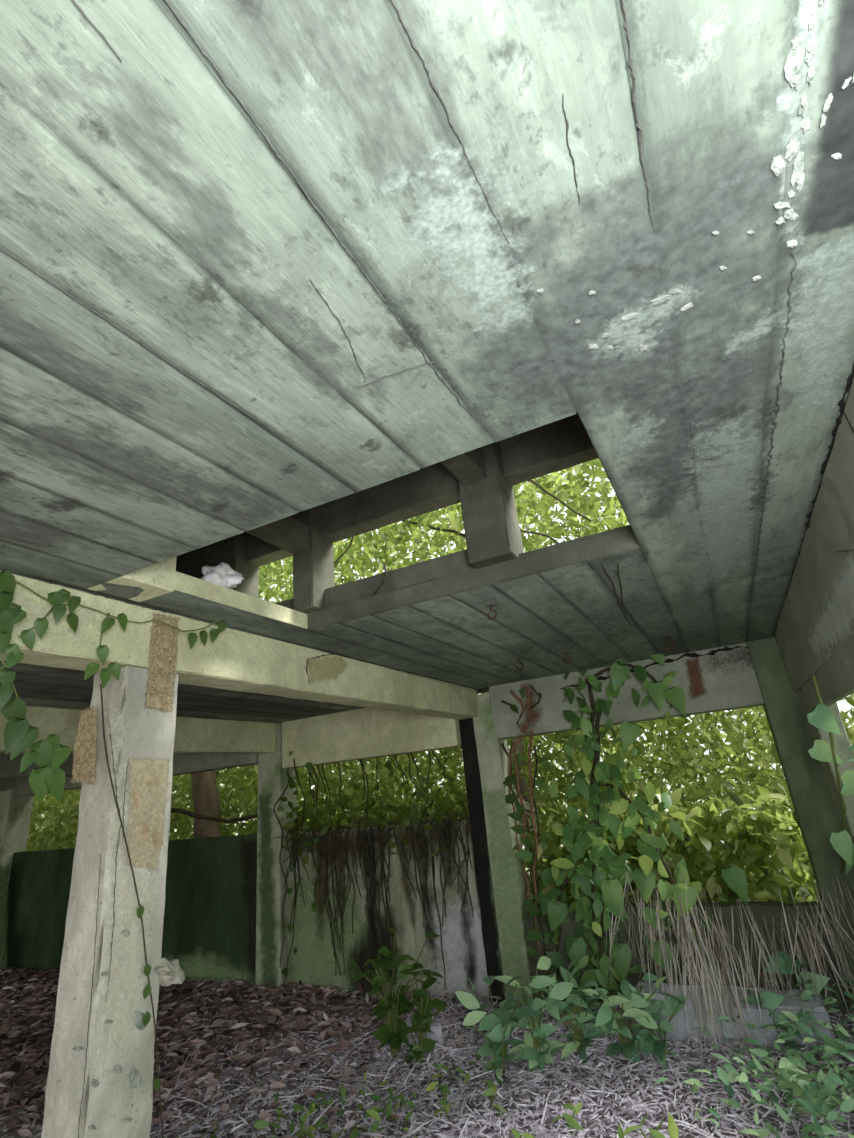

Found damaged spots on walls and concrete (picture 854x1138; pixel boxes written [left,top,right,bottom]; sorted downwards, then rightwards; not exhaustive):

crack [391,0,509,243]
leakage [399,141,555,316]
crack [562,96,580,203]
spalling [588,332,613,350]
spalling [621,312,640,322]
crack [620,0,653,224]
leakage [486,0,854,589]
spalling [651,288,693,311]
peeling [770,0,854,226]
crack [789,364,854,587]
corrosion [686,657,705,698]
leakage [291,819,489,997]